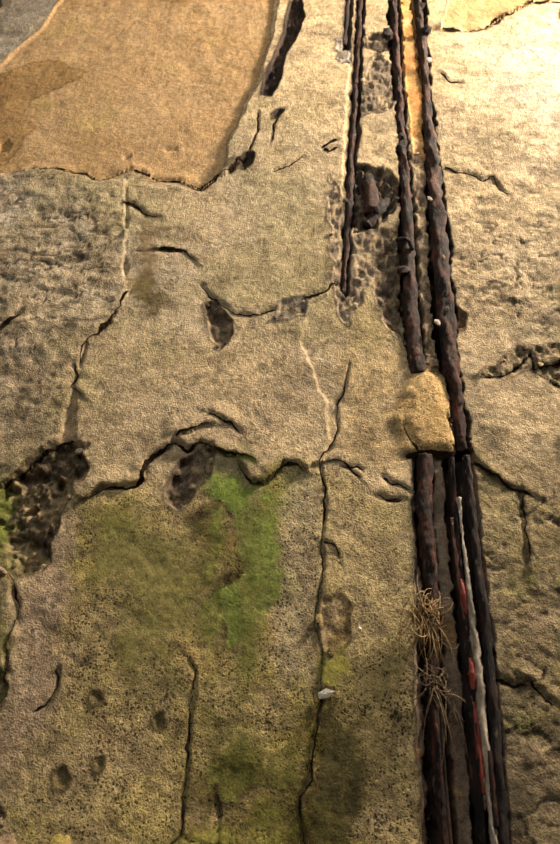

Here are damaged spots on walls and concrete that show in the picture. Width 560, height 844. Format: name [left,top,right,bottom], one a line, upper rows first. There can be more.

peeling [0,0,306,191]
spalling [335,38,353,64]
crack [443,0,560,32]
spalling [360,0,439,368]
spalling [325,164,406,346]
crack [71,290,129,394]
spalling [475,342,560,387]
spalling [0,439,91,576]
crack [379,477,409,502]
crack [403,420,534,561]
crack [82,369,363,844]
spalling [48,834,71,844]